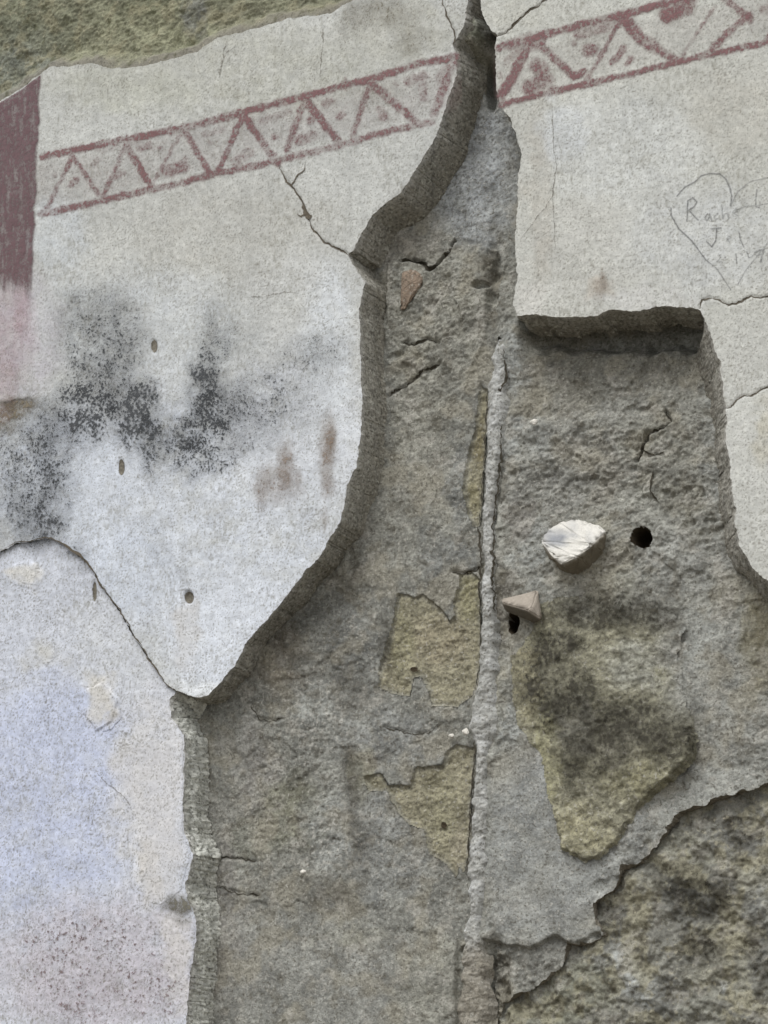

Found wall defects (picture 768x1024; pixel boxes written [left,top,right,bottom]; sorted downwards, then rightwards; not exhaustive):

spalling [0,0,352,101]
crack [442,0,456,44]
crack [498,0,545,36]
crack [279,162,349,255]
crack [700,296,768,306]
leakage [0,289,301,556]
crack [639,413,672,501]
spalling [103,0,522,1024]
crack [2,537,175,690]
spalling [472,257,768,1024]